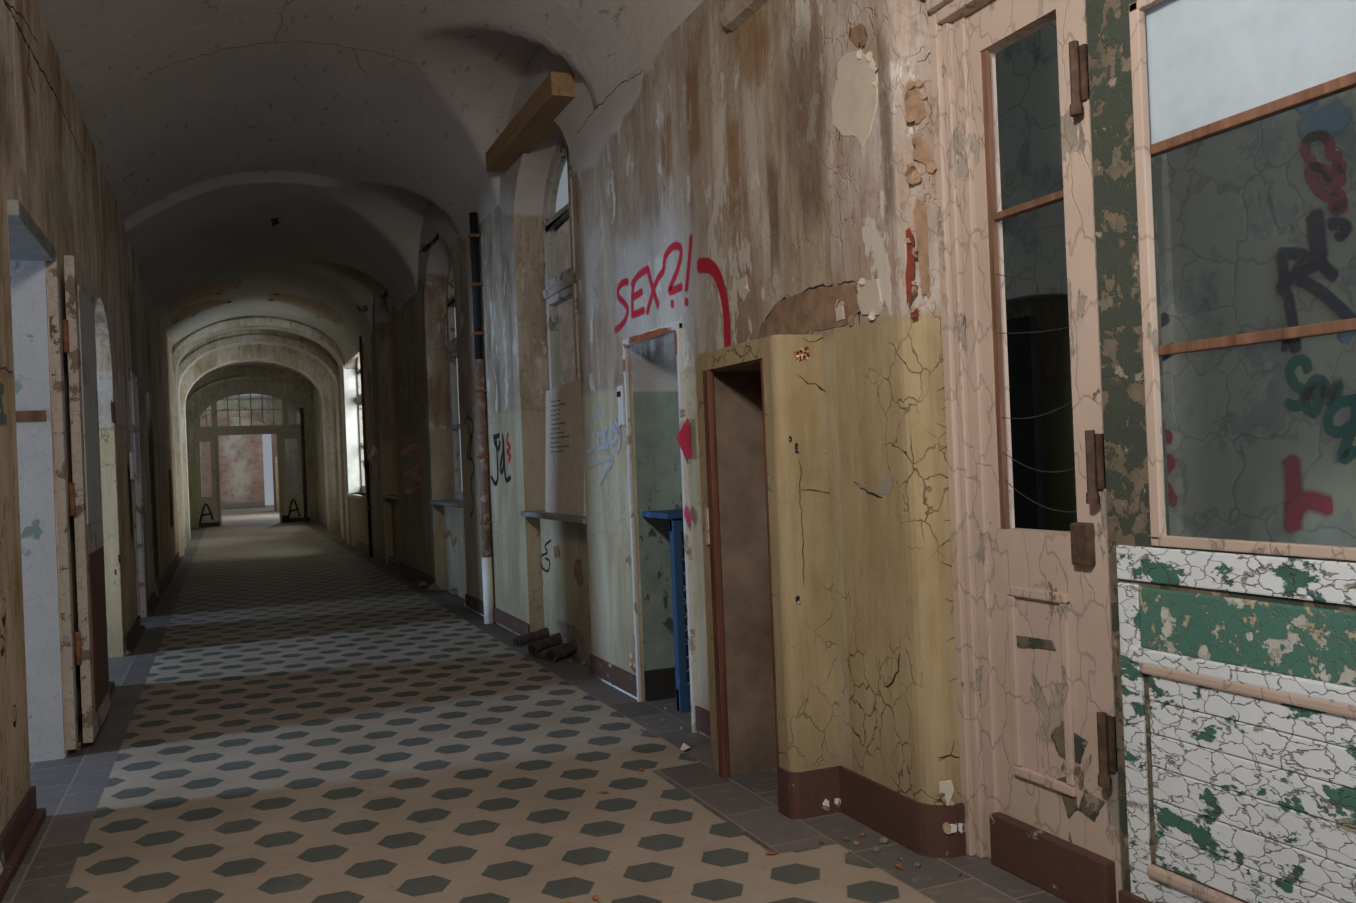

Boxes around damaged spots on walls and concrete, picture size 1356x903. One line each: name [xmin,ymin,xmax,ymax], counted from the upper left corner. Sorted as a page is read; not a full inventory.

crack [3,0,89,175]
peeling [832,23,878,148]
peeling [904,79,936,318]
spalling [757,277,884,339]
crack [799,453,882,581]
crack [884,653,900,688]